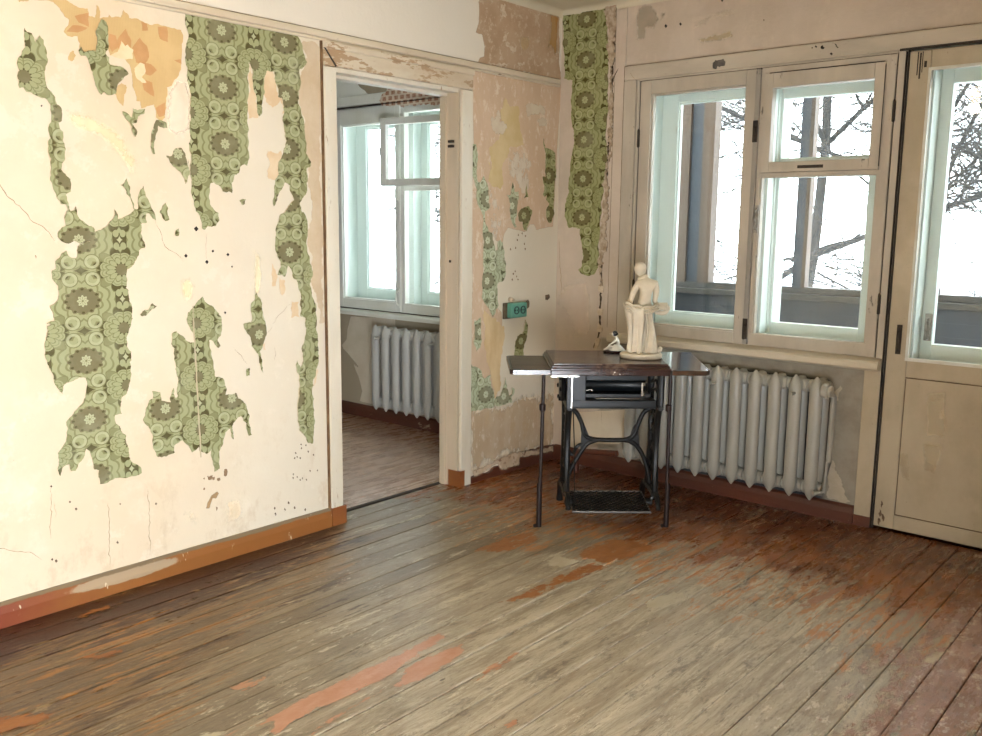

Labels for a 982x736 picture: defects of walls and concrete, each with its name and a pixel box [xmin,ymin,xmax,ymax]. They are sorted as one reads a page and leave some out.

flaking render [358,84,387,94]
peeling [597,5,617,286]
crack [0,185,55,241]
flaking render [471,0,561,398]
flaking render [570,410,625,447]
spalling [473,446,553,477]